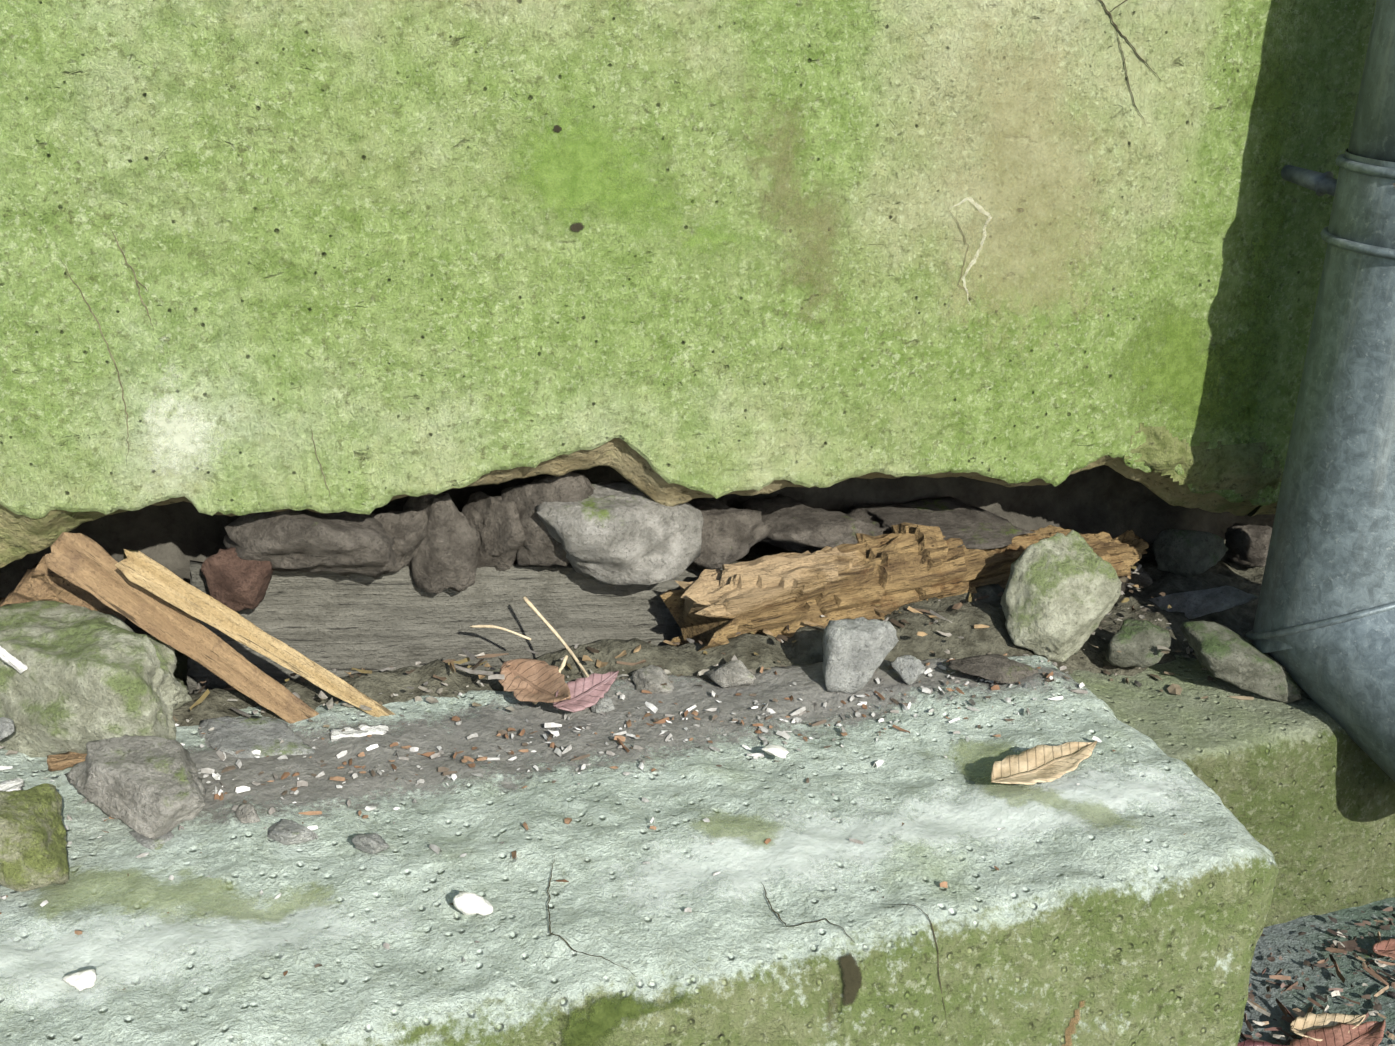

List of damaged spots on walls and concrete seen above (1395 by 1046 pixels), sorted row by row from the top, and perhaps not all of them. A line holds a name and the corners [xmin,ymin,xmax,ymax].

crack [547,856,635,976]
crack [762,884,855,943]
crack [891,904,947,1023]